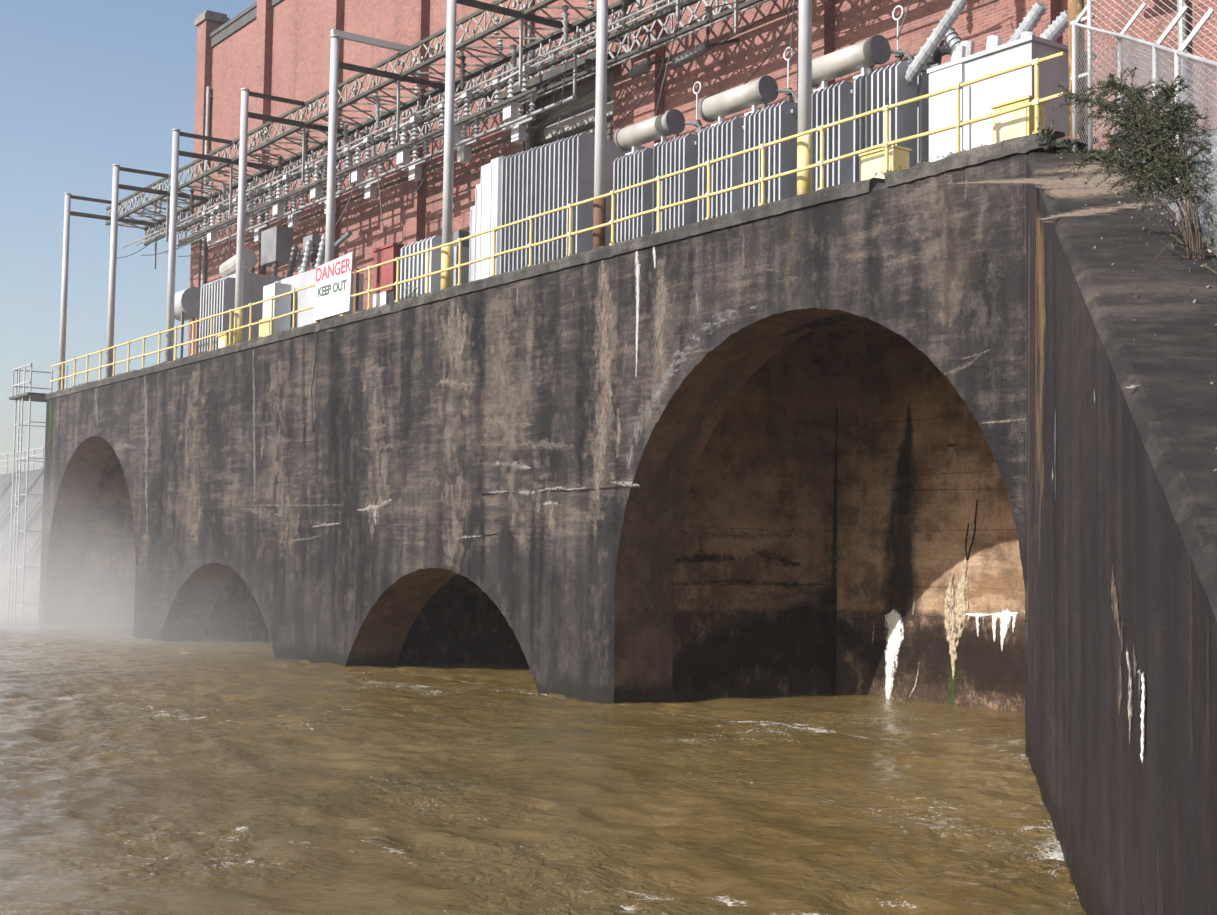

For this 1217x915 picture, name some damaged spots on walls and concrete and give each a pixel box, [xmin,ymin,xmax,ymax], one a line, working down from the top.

water stain [672,406,1025,699]
efflorescence [1126,651,1145,763]